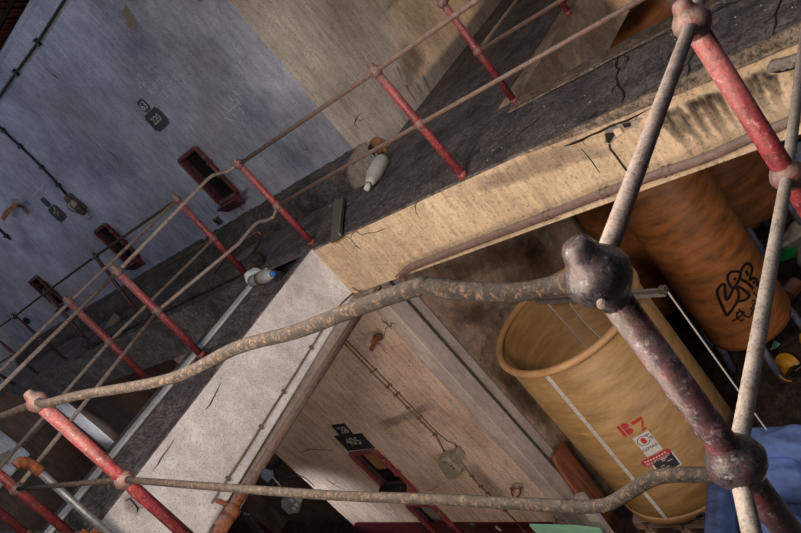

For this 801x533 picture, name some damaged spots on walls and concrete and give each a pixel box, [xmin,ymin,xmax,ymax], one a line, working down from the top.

crack [711,0,741,14]
crack [765,0,782,35]
crack [543,30,694,173]